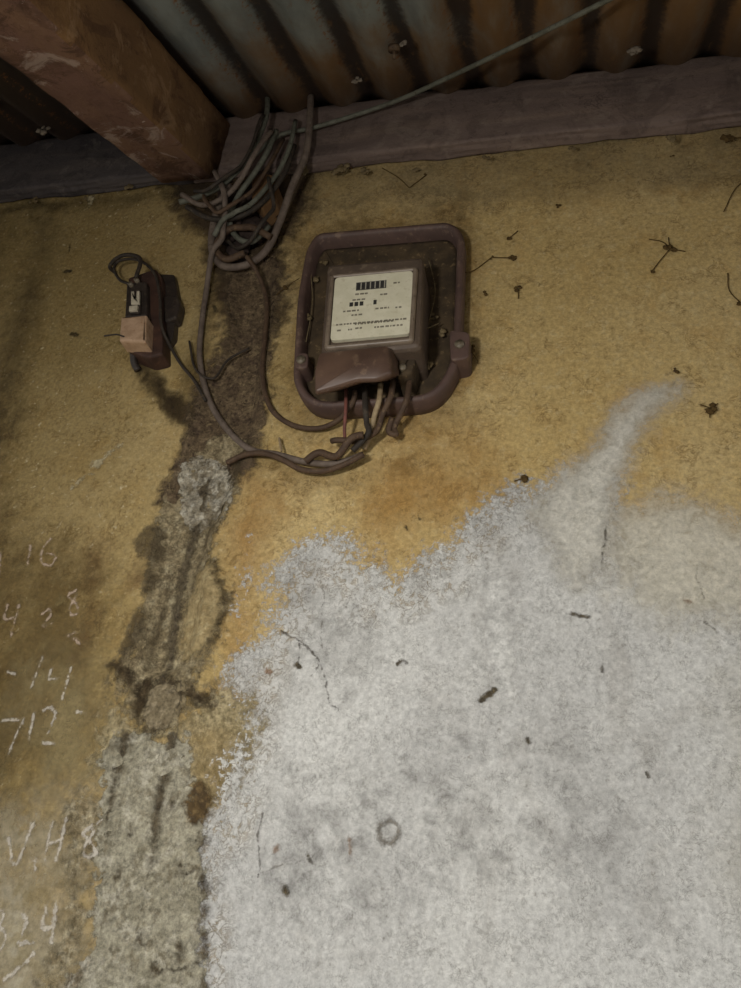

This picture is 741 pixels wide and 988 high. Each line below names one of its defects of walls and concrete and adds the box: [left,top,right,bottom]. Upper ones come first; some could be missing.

leakage [376,819,401,845]